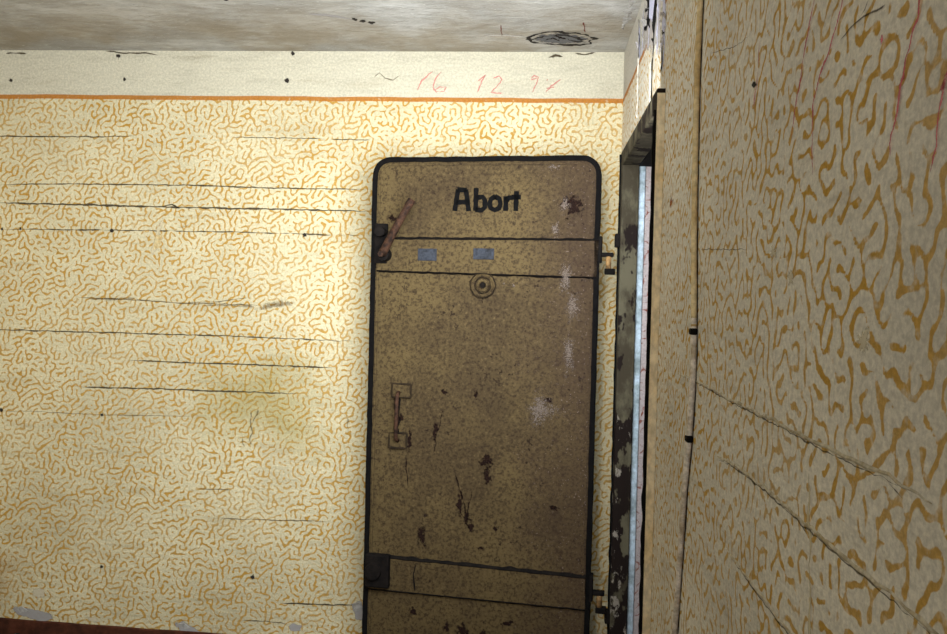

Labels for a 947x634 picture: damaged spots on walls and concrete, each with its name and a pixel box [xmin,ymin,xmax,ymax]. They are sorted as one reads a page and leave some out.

crack [0,132,127,140]
crack [234,134,363,142]
crack [678,372,933,505]
crack [717,456,939,634]
rust [442,621,486,634]